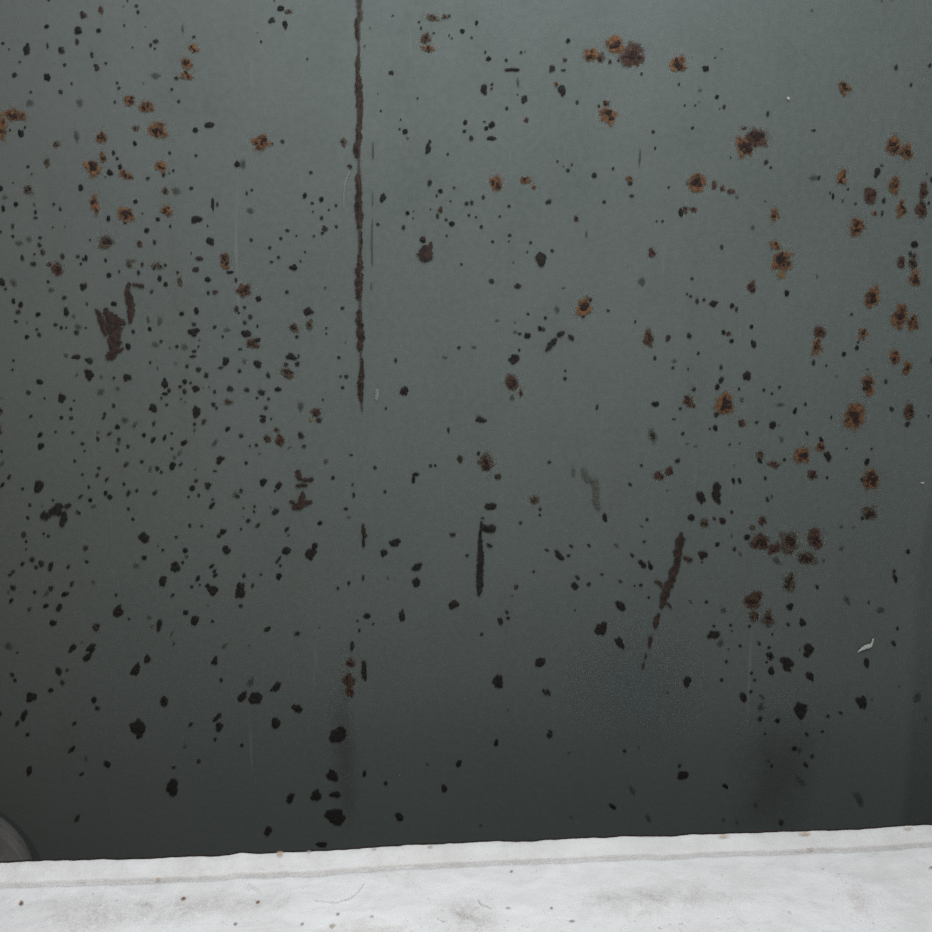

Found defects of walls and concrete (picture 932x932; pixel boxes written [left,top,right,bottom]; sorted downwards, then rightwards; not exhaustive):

corrosion [585,35,645,66]
peeling [268,193,338,270]
corrosion [340,0,365,411]
corrosion [95,282,144,360]
peeling [0,450,89,626]
peeling [235,527,318,608]
corrosion [476,521,496,596]
corrosion [642,532,693,669]
peeling [688,465,750,563]
corrosion [749,516,822,563]
peeling [238,678,281,704]
peeling [287,769,345,825]